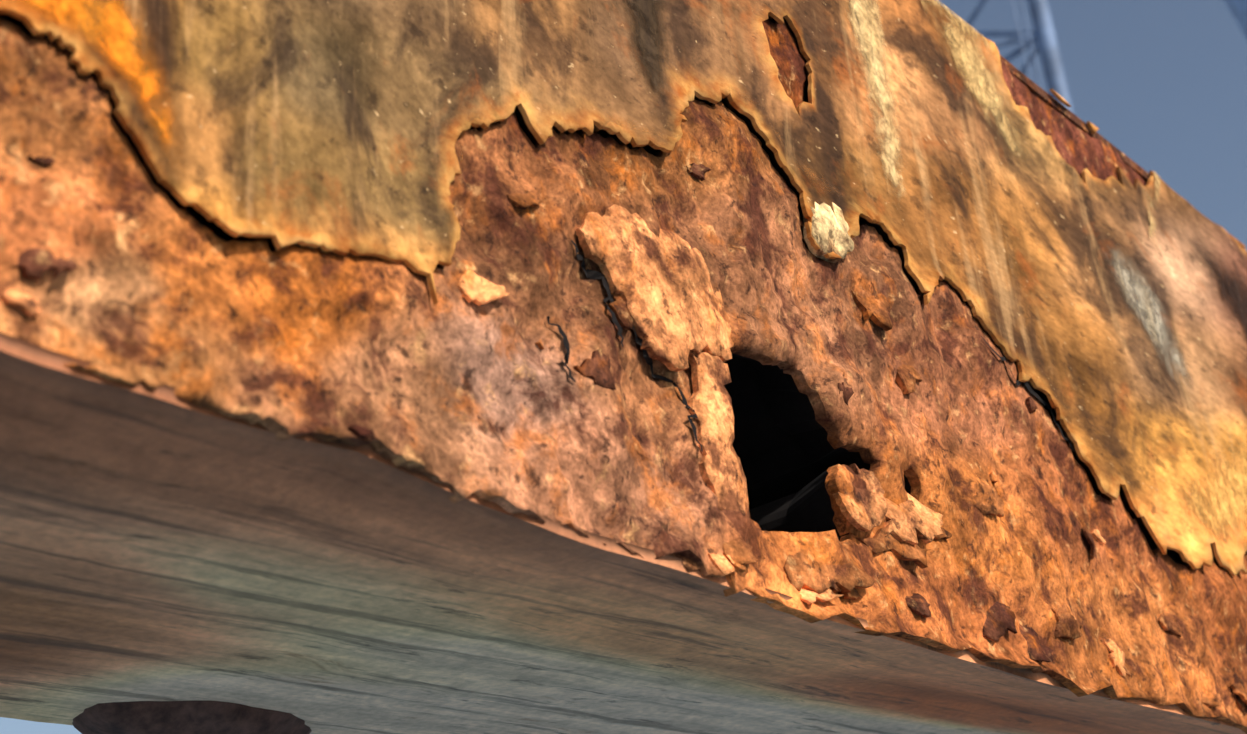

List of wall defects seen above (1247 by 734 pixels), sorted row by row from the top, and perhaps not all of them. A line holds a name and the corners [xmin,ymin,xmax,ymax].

spalling [762,18,808,108]
rust [457,270,510,306]
water stain [1117,264,1163,344]
rust [652,350,749,514]
rust [832,463,888,532]
rust [883,492,943,545]
rust [973,482,1005,518]
water stain [1190,444,1247,533]
rust [722,537,758,573]
rust [783,540,876,594]
rust [856,528,931,569]
rust [1099,637,1131,679]